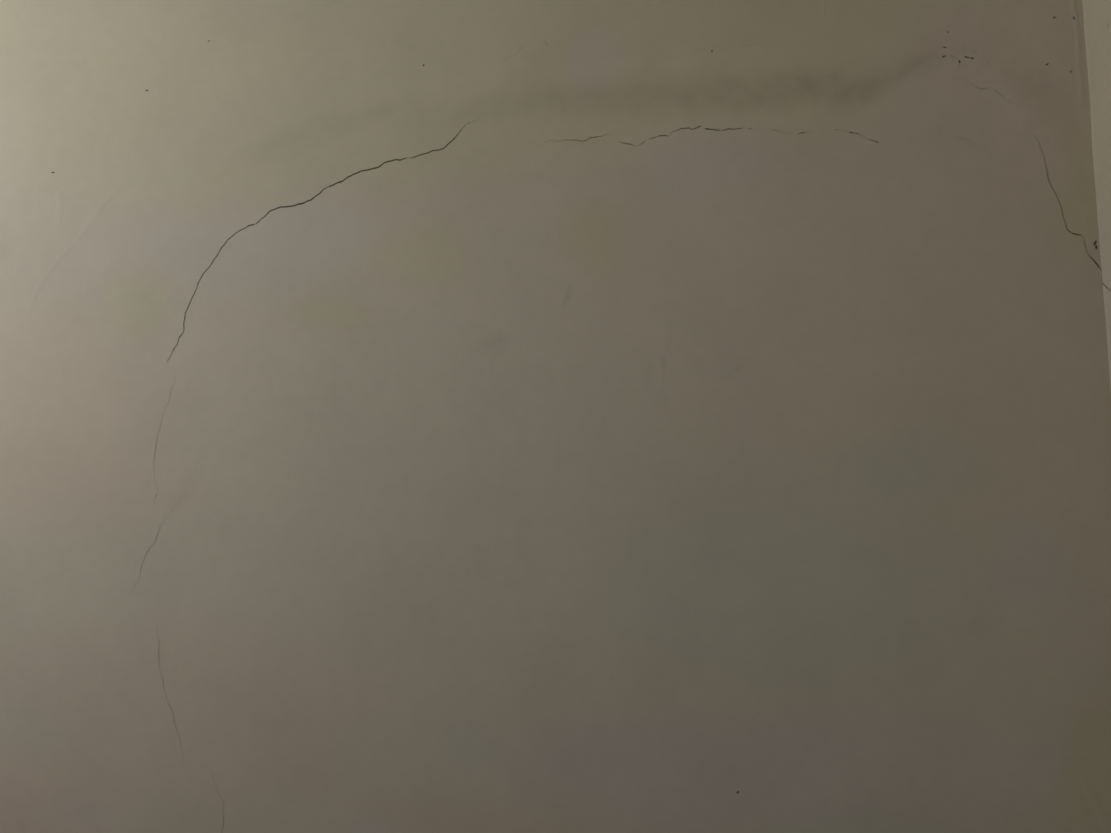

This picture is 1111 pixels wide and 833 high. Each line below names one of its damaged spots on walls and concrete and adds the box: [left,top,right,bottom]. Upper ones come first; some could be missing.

crack [173,134,458,350]